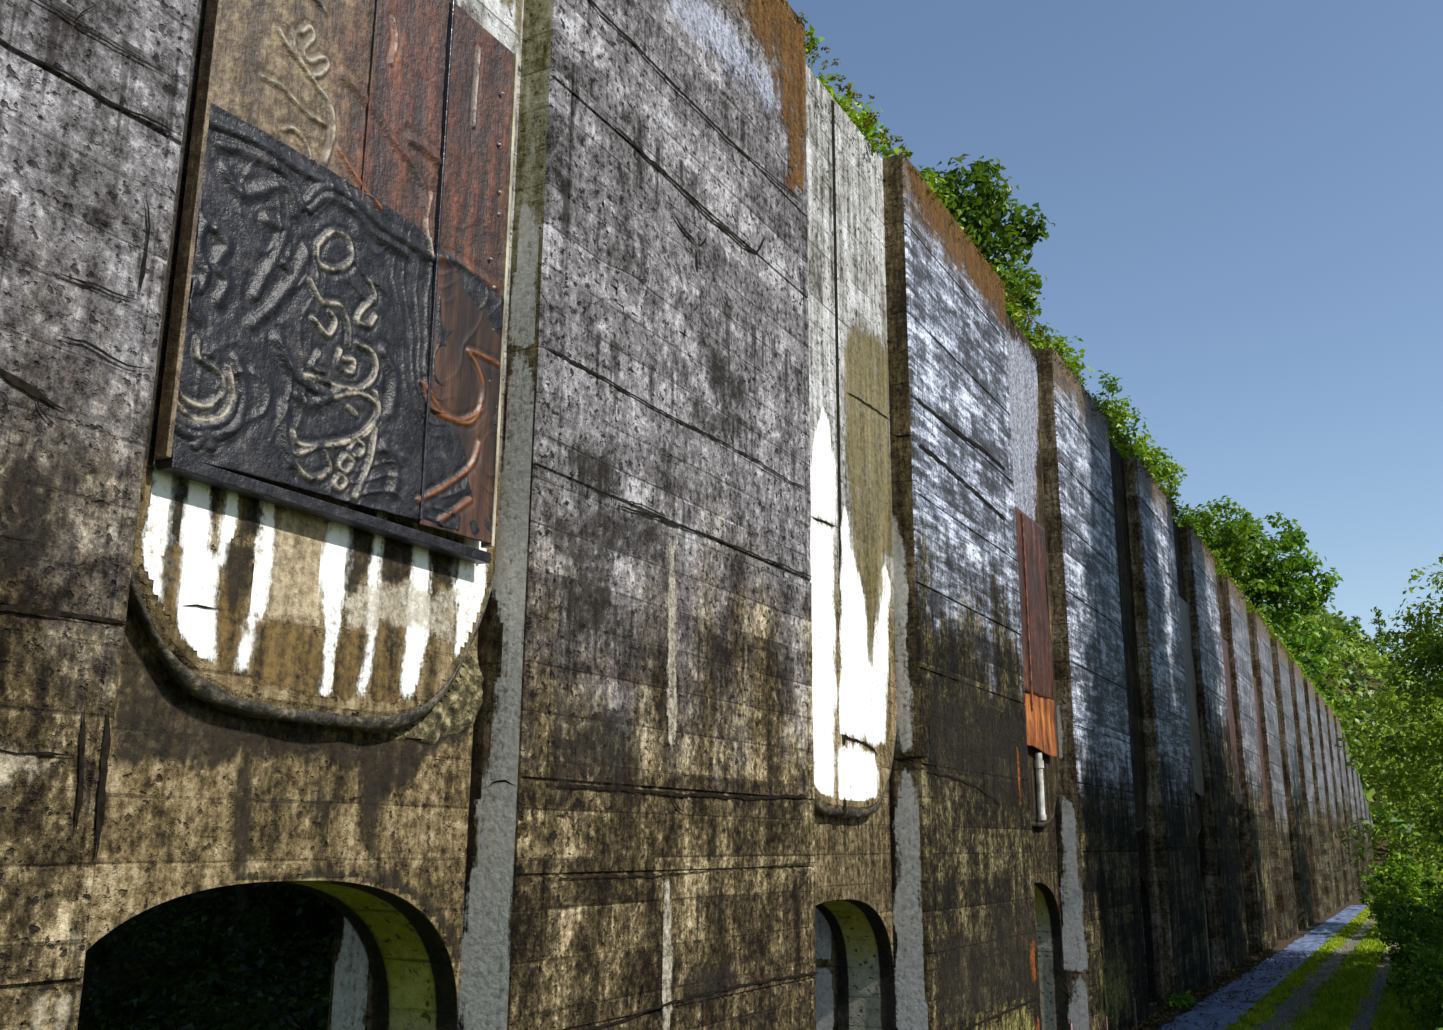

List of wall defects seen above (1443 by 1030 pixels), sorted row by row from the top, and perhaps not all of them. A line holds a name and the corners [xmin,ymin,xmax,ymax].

leakage [842,326,893,663]